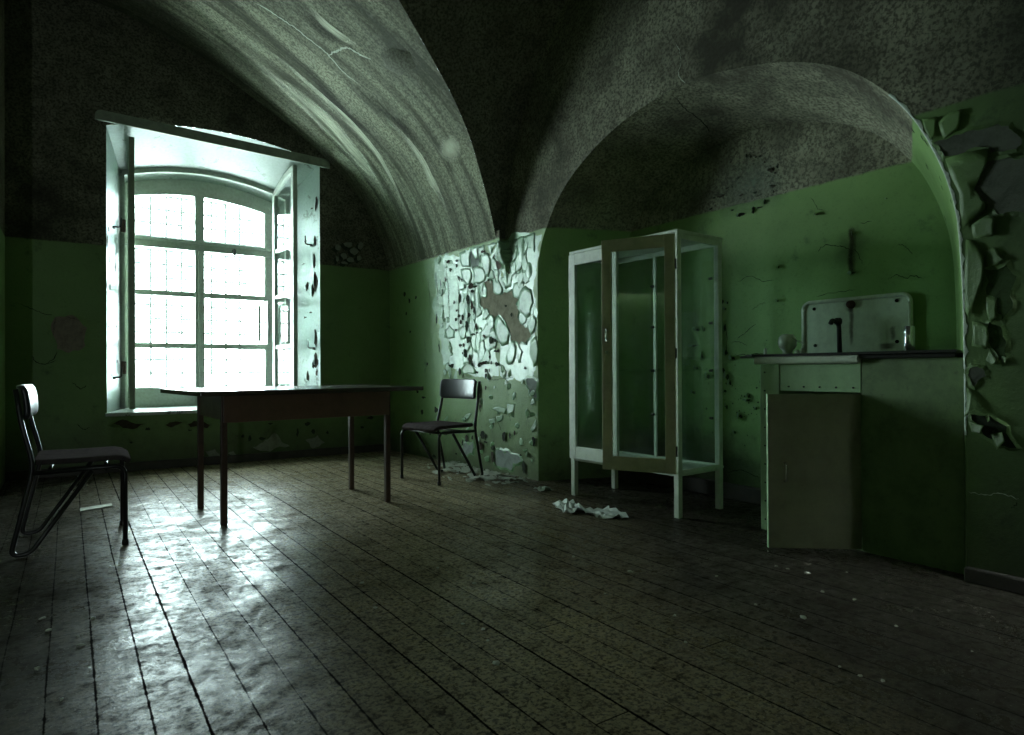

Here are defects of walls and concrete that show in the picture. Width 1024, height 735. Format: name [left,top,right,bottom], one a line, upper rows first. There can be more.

crack [260,5,370,82]
peeling [302,236,318,297]
peeling [889,94,1024,451]
peeling [305,329,319,381]
peeling [432,232,542,474]